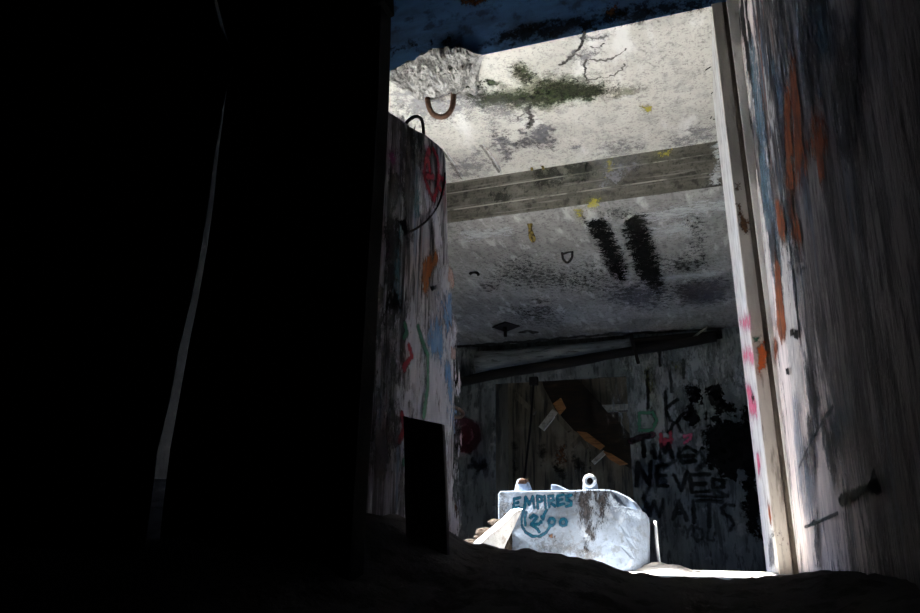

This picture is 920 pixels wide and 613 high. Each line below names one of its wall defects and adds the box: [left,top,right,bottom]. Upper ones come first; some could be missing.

spalling [390,46,485,102]
crack [558,31,627,81]
leakage [534,139,645,188]
leakage [369,65,617,486]